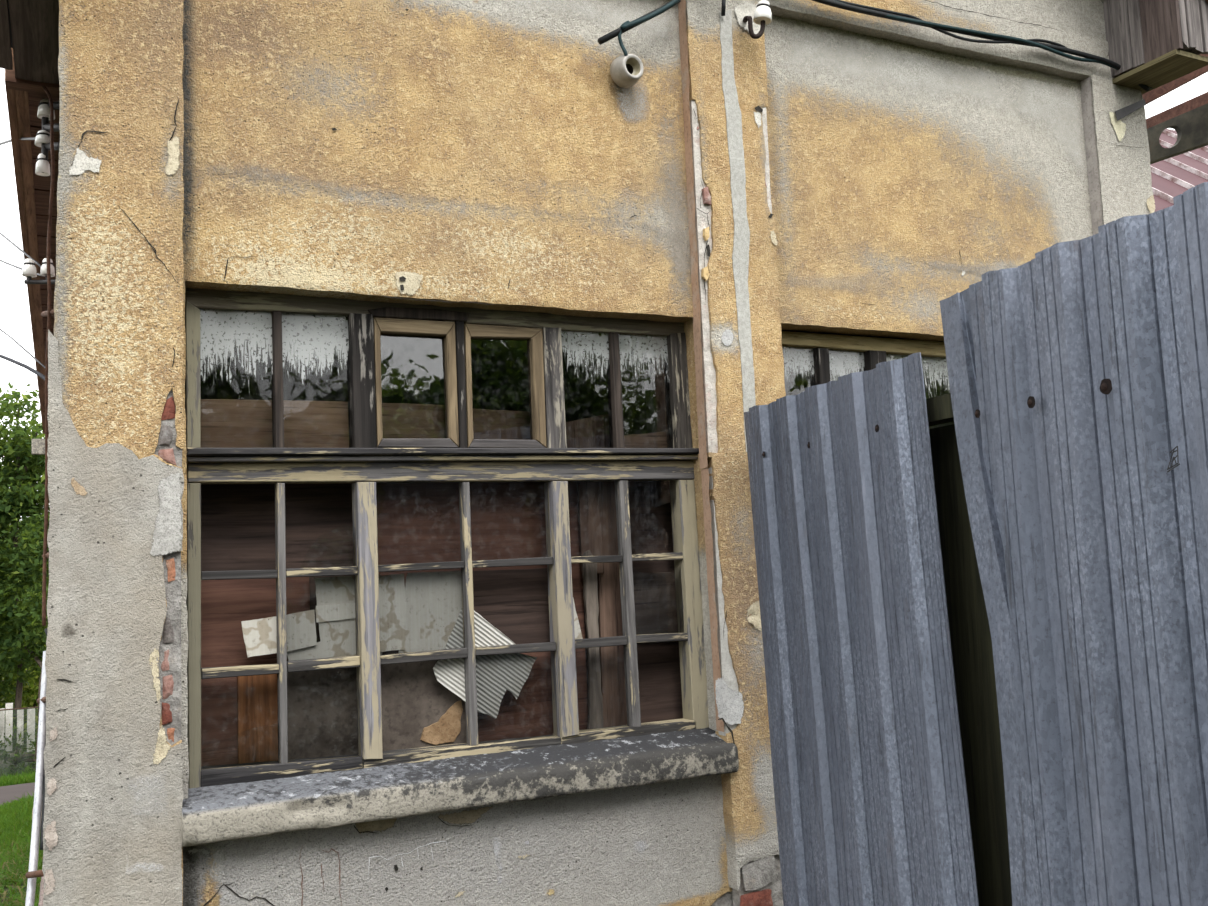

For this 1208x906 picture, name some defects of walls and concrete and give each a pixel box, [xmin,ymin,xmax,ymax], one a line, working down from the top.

peeling [735,2,760,34]
peeling [69,148,102,175]
peeling [165,136,180,175]
crack [119,207,178,283]
flaking render [154,389,182,467]
flaking render [689,100,744,736]
flaking render [149,551,182,764]
crack [203,882,275,906]
flaking render [711,855,784,906]